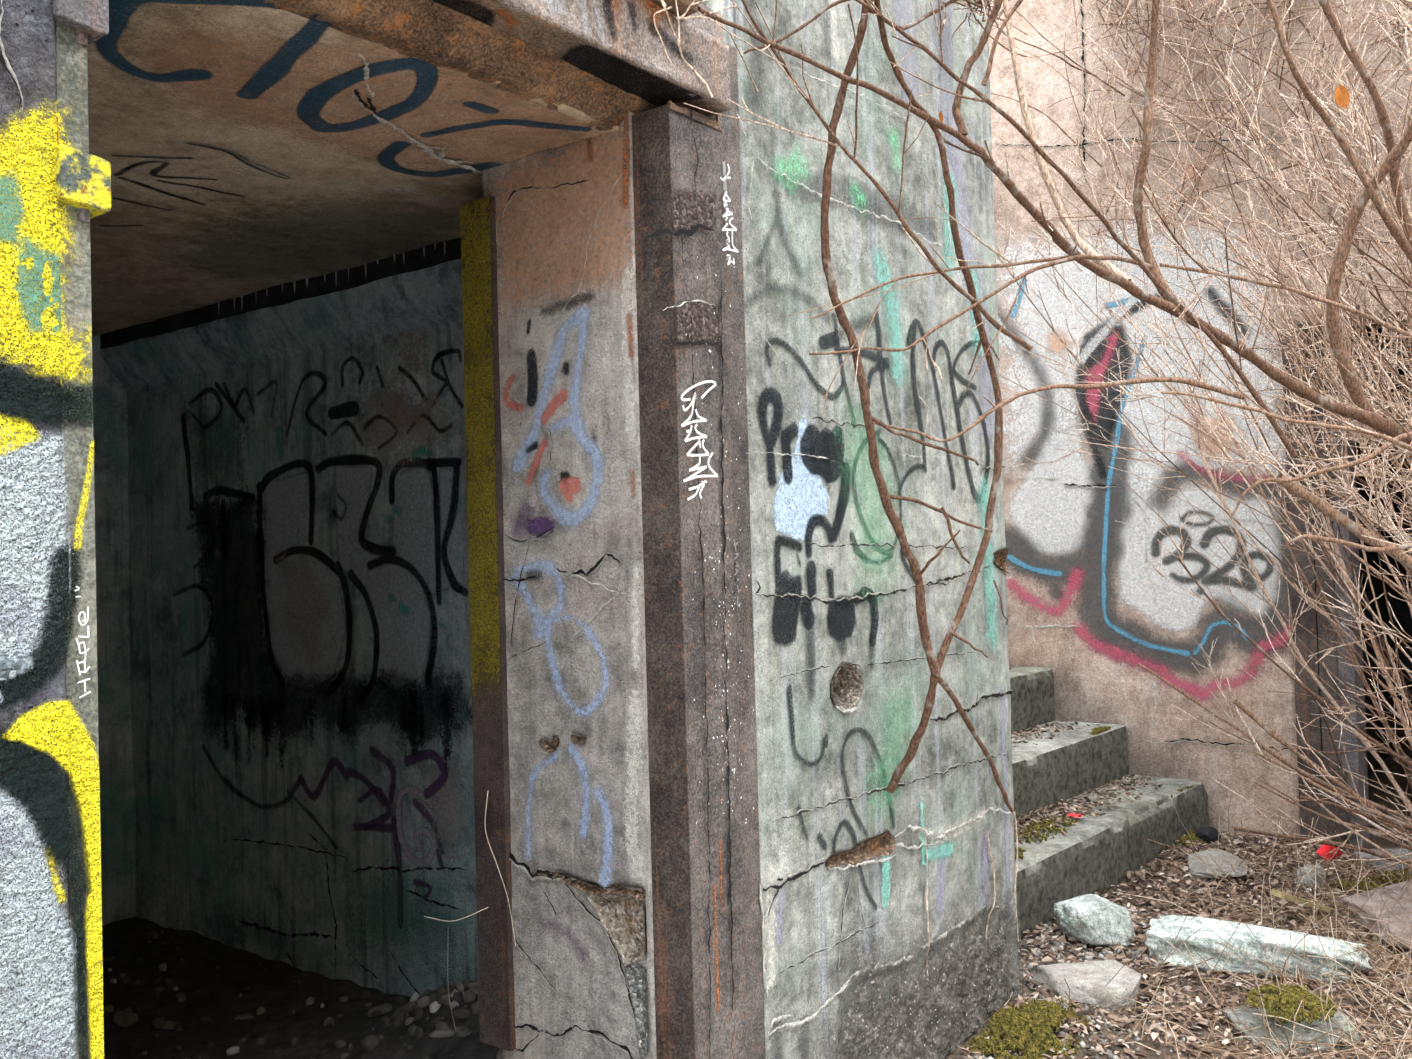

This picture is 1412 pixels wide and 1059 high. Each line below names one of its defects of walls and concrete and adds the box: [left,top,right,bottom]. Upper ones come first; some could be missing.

crack [0,0,24,113]
crack [679,106,699,261]
crack [503,527,634,657]
crack [663,272,1013,1059]
crack [509,852,635,1059]
spalling [536,872,648,1059]
rust [714,841,722,1010]